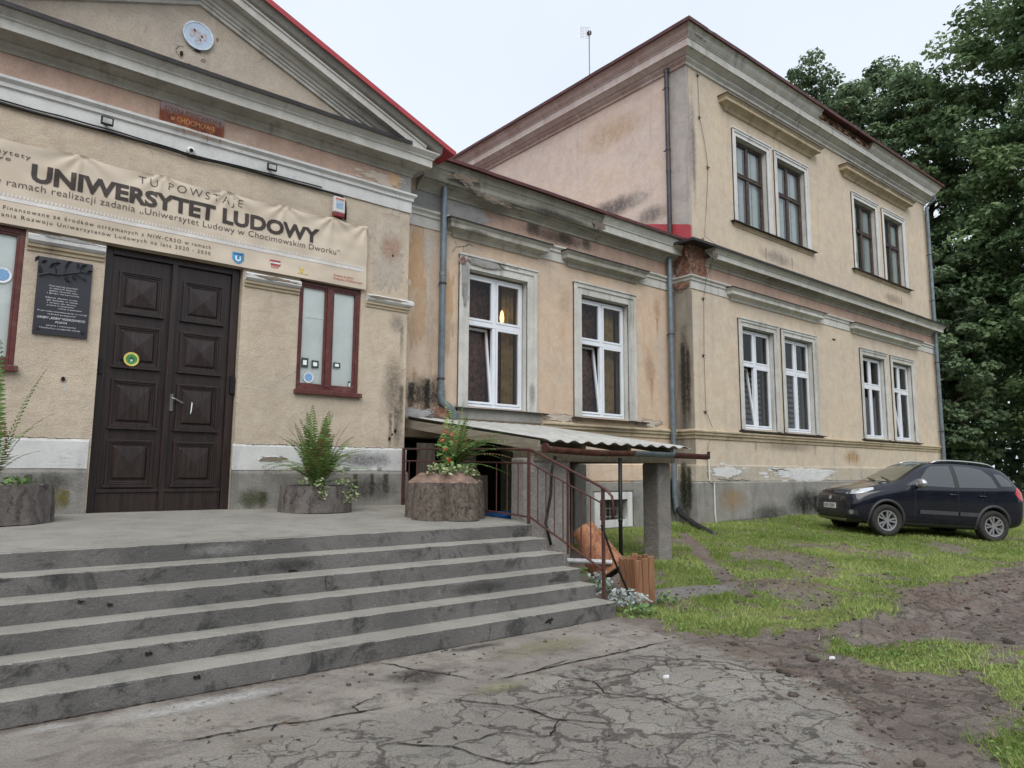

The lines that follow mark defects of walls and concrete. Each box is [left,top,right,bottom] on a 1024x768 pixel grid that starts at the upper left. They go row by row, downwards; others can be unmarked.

flaking render [673,238,718,291]
damp [407,380,441,408]
damp [681,345,690,409]
peeling [707,462,747,479]
peeling [759,467,837,481]
crack [0,620,713,764]